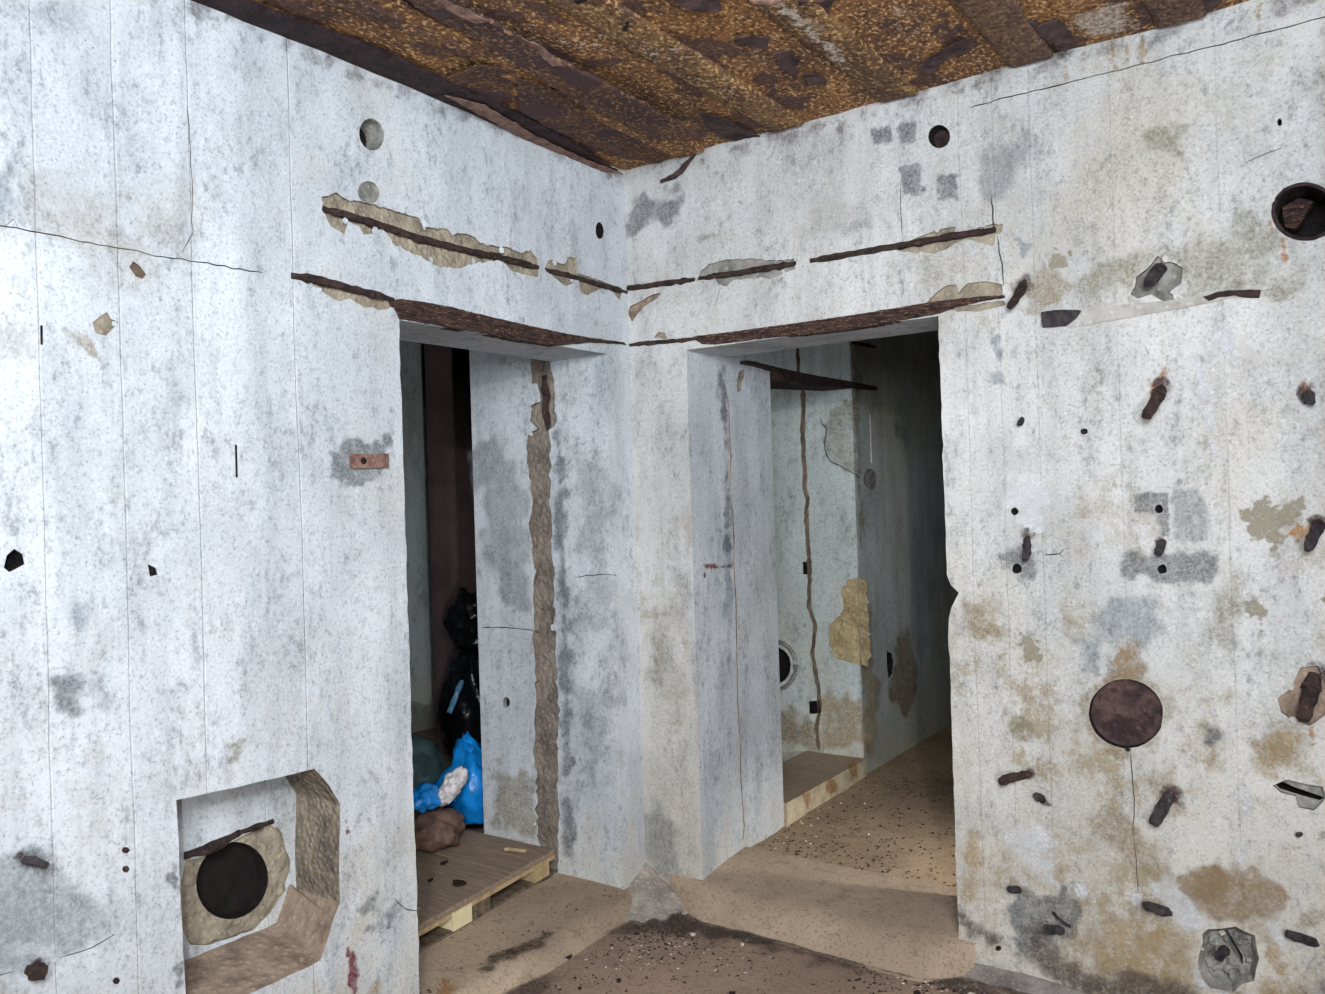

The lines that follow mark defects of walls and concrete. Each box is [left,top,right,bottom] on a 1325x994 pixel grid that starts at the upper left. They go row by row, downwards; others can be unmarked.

rust [191,0,624,175]
rust [408,0,704,142]
crack [0,106,263,273]
spalling [321,192,662,321]
spalling [1131,255,1183,301]
rust [1290,515,1325,541]
spalling [526,359,560,874]
spalling [829,577,872,668]
spalling [1278,661,1325,726]
spalling [1273,779,1325,811]
spalling [180,825,290,945]
spalling [1198,926,1259,994]